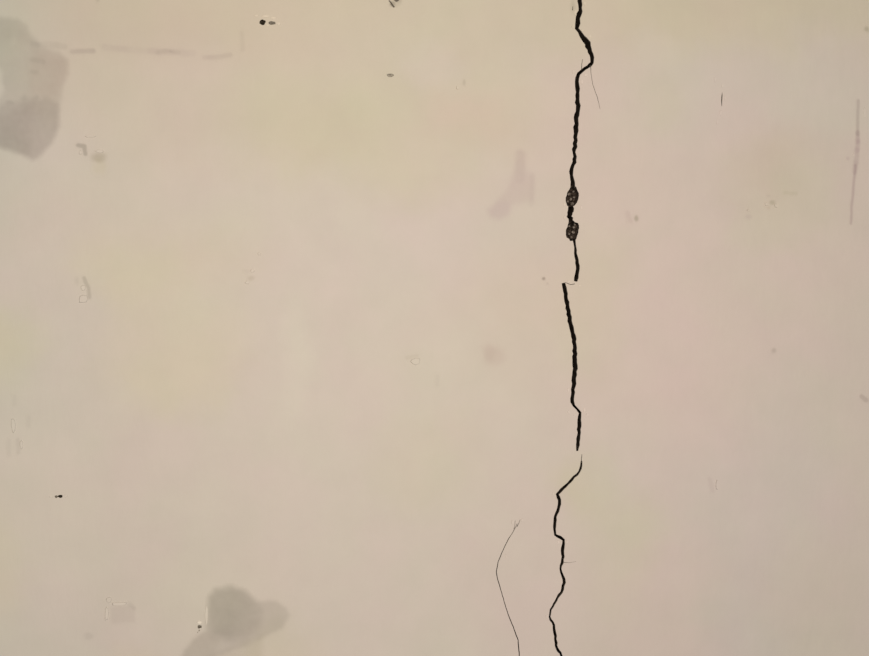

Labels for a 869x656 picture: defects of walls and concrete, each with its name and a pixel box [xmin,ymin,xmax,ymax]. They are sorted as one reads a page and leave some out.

water stain [0,13,246,163]
crack [546,0,600,656]
water stain [179,583,293,656]
crack [496,518,523,656]